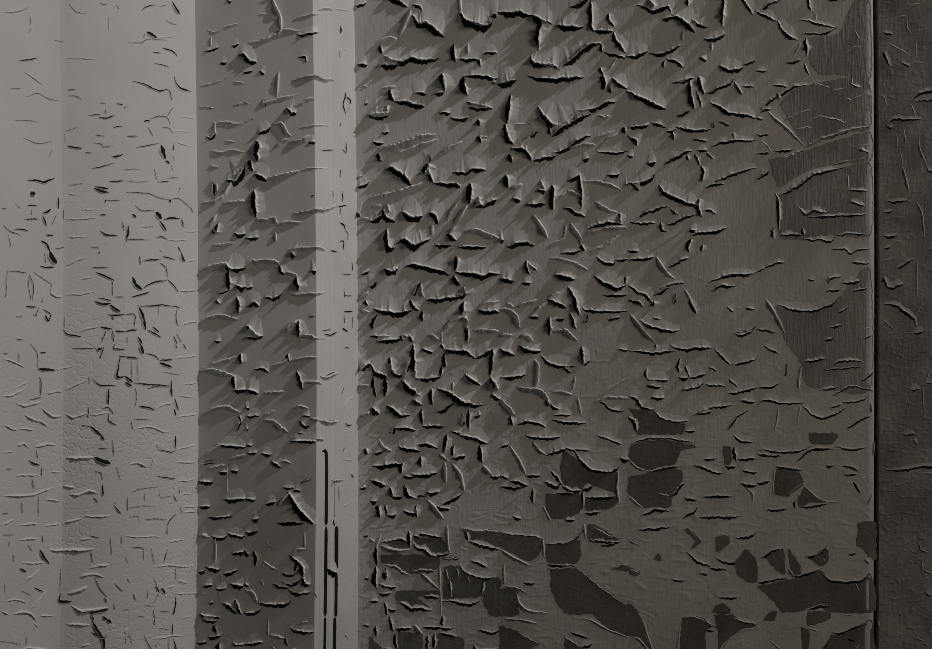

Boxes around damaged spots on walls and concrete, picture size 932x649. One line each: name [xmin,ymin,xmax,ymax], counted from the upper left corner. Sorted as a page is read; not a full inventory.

peeling [200,0,321,87]
peeling [200,71,328,341]
peeling [356,0,932,649]
peeling [197,354,322,649]